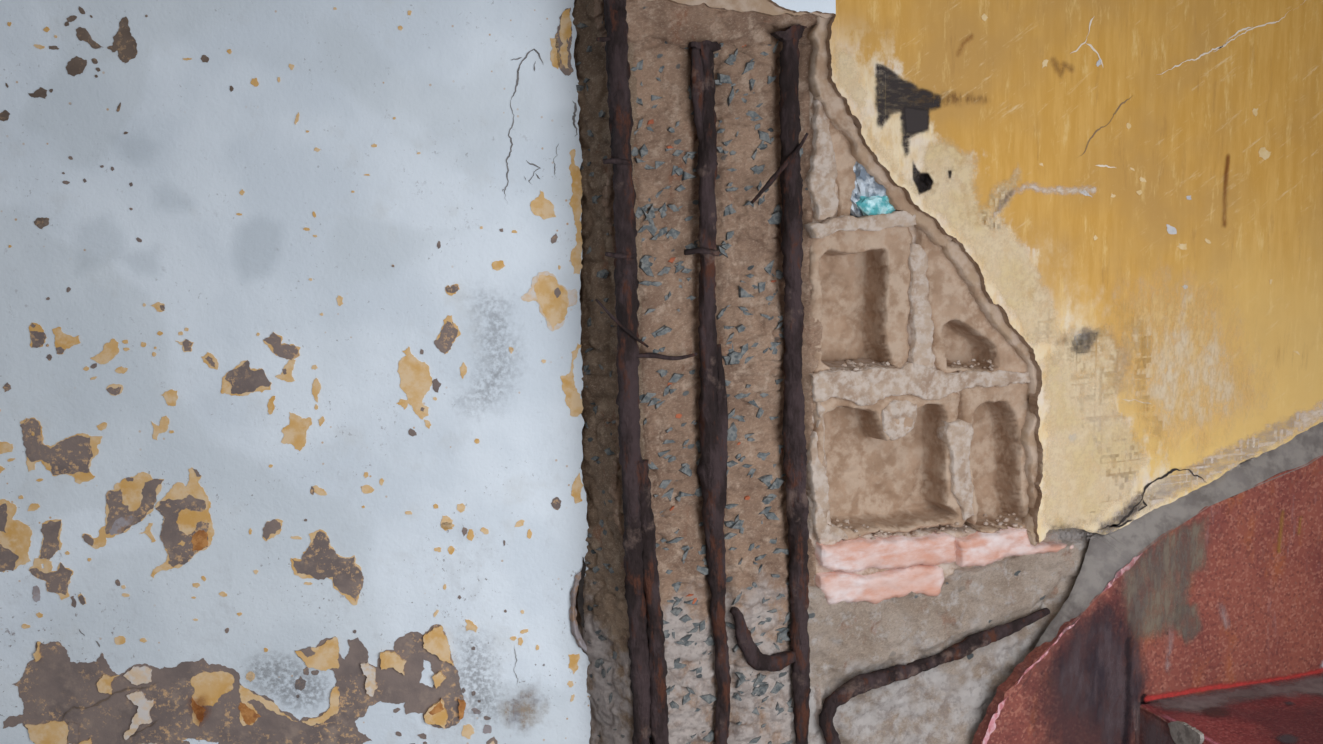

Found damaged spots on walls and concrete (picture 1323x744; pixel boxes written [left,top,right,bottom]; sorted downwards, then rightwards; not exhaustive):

peeling [34,6,138,78]
crack [503,49,577,201]
peeling [0,417,107,484]
peeling [82,468,214,578]
peeling [83,328,325,451]
spalling [521,0,634,744]
rust [716,344,728,490]
spalling [626,0,1323,744]
water stain [1048,495,1142,541]
crack [1098,468,1204,530]
peeling [0,495,498,744]
water stain [1045,523,1323,744]